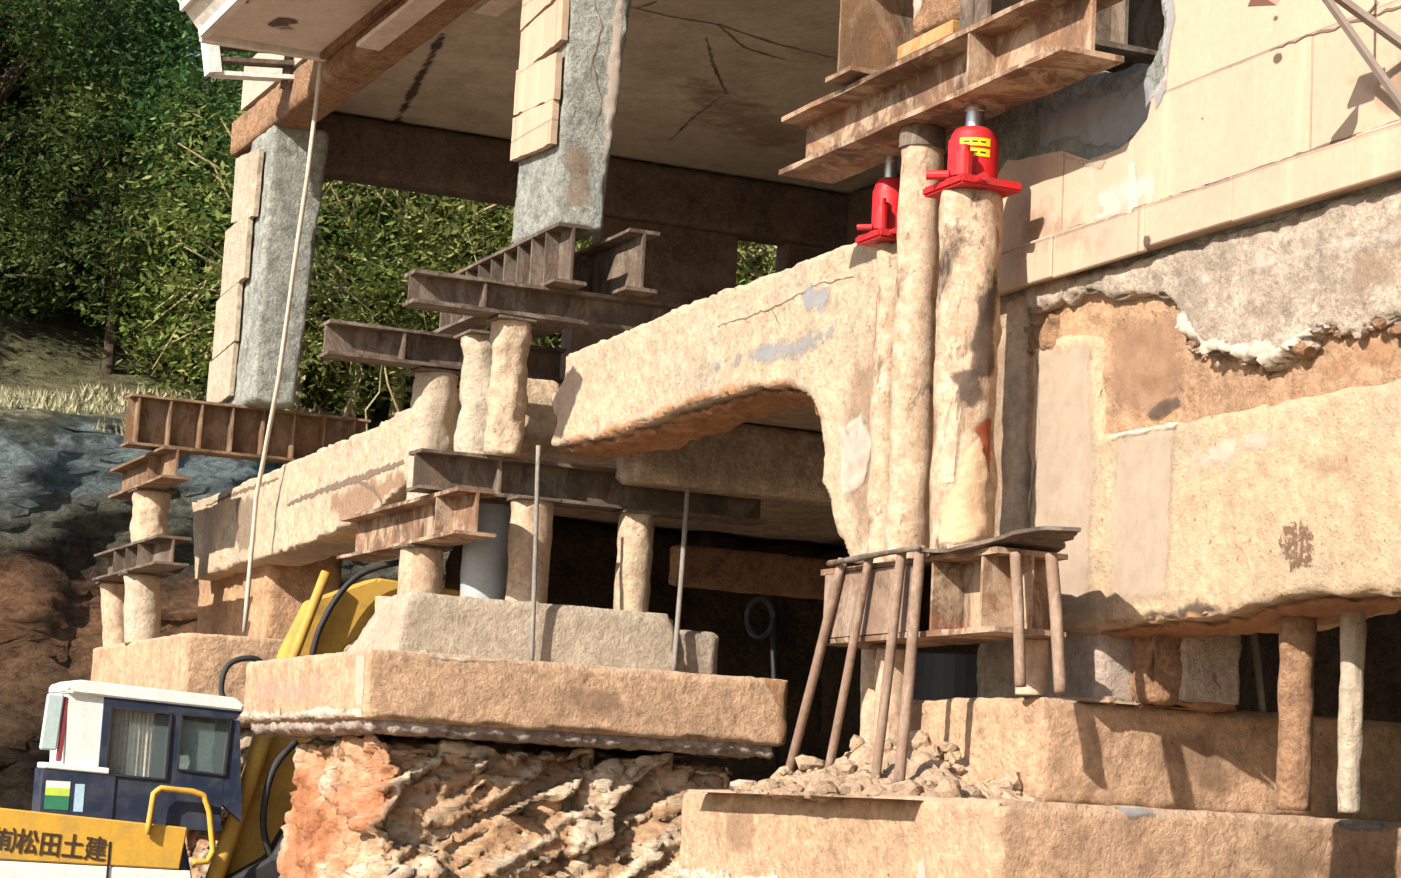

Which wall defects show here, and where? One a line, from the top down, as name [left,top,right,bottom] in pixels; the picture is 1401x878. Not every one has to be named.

crack [394,33,445,123]
crack [580,1,836,141]
spalling [1024,185,1401,374]
spalling [552,366,819,460]
leakage [1278,521,1314,572]